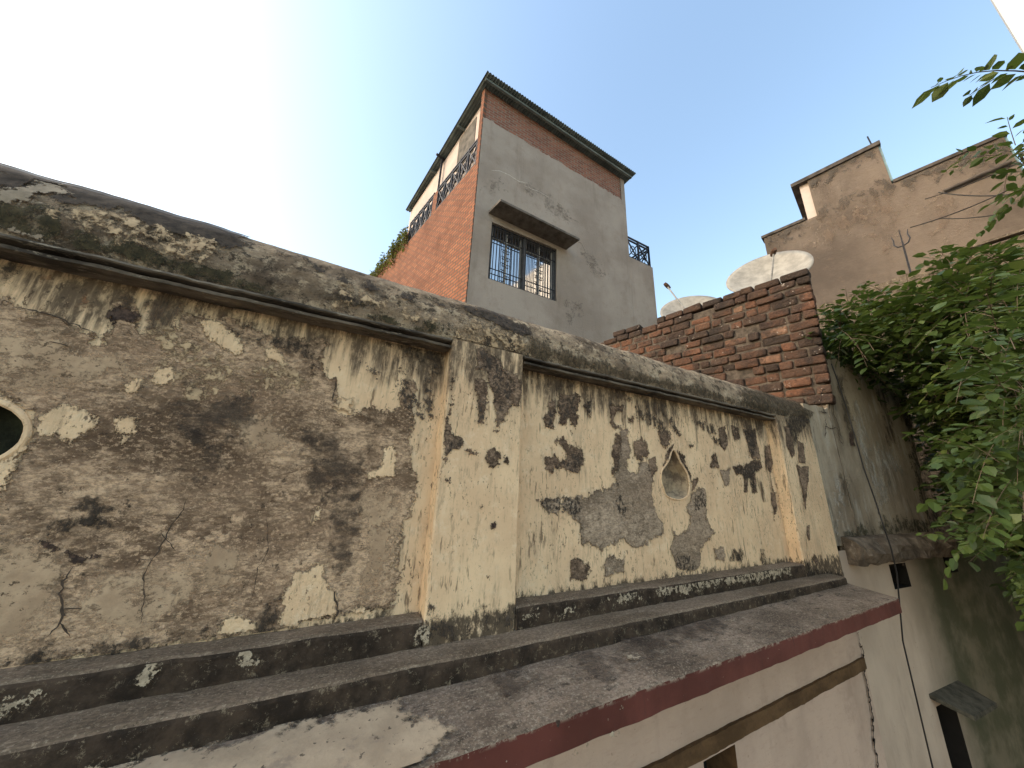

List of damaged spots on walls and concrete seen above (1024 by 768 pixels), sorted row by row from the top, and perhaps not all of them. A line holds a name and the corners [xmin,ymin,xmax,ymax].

water stain [0,163,249,249]
water stain [122,292,203,329]
peeling [0,294,422,669]
water stain [171,396,255,483]
water stain [300,429,363,575]
peeling [442,373,509,468]
peeling [453,319,532,433]
peeling [536,392,726,577]
peeling [710,425,773,494]
crack [48,566,81,637]
crack [136,496,189,621]
peeling [570,557,591,582]